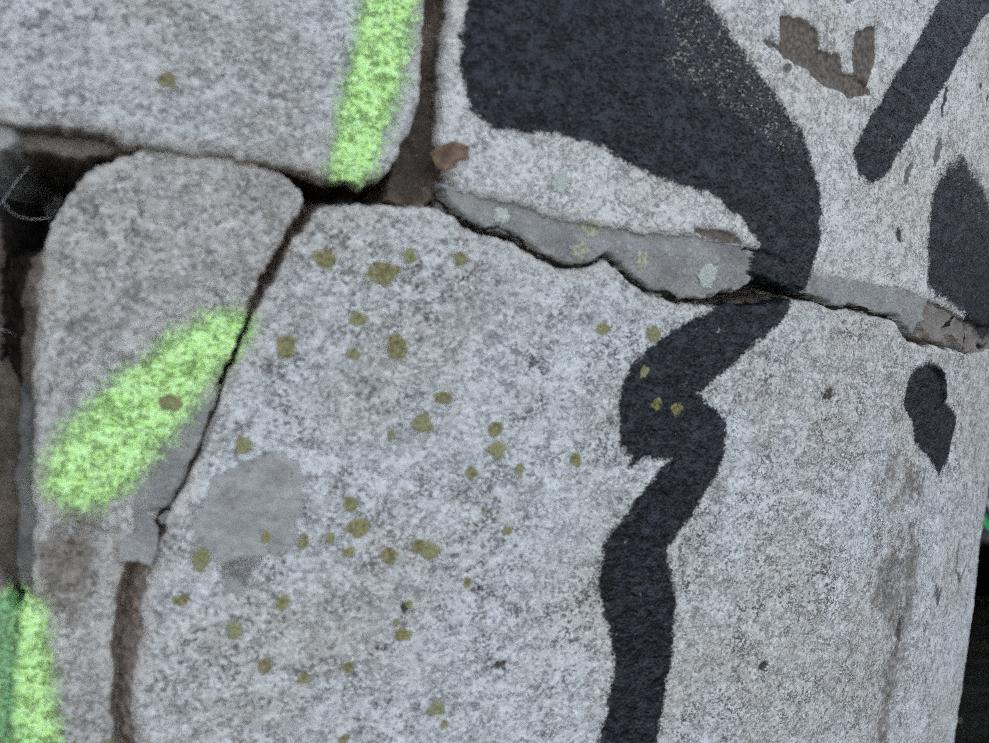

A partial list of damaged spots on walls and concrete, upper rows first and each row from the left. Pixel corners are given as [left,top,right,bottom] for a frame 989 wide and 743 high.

spalling [763,15,875,99]
crack [434,197,720,303]
crack [746,274,903,337]
crack [942,315,984,360]
crack [109,196,329,743]